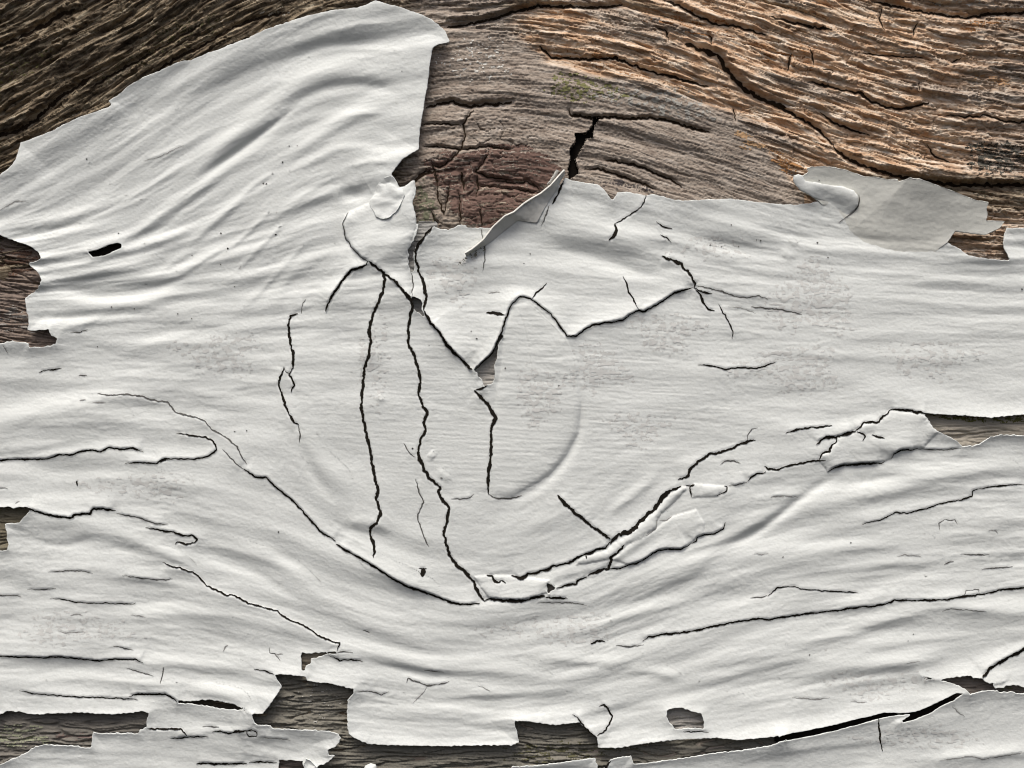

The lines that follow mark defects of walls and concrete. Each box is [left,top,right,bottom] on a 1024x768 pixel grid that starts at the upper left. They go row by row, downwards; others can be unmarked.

peeling [369,176,405,219]
peeling [408,221,438,272]
peeling [0,267,57,348]
crack [0,100,961,606]
crack [864,484,1024,529]
crack [0,487,370,702]
crack [591,530,1024,648]
peeling [0,711,149,764]
peeling [181,700,242,710]
peeling [253,674,776,768]
peeling [607,690,1024,768]
peeling [941,676,1024,694]